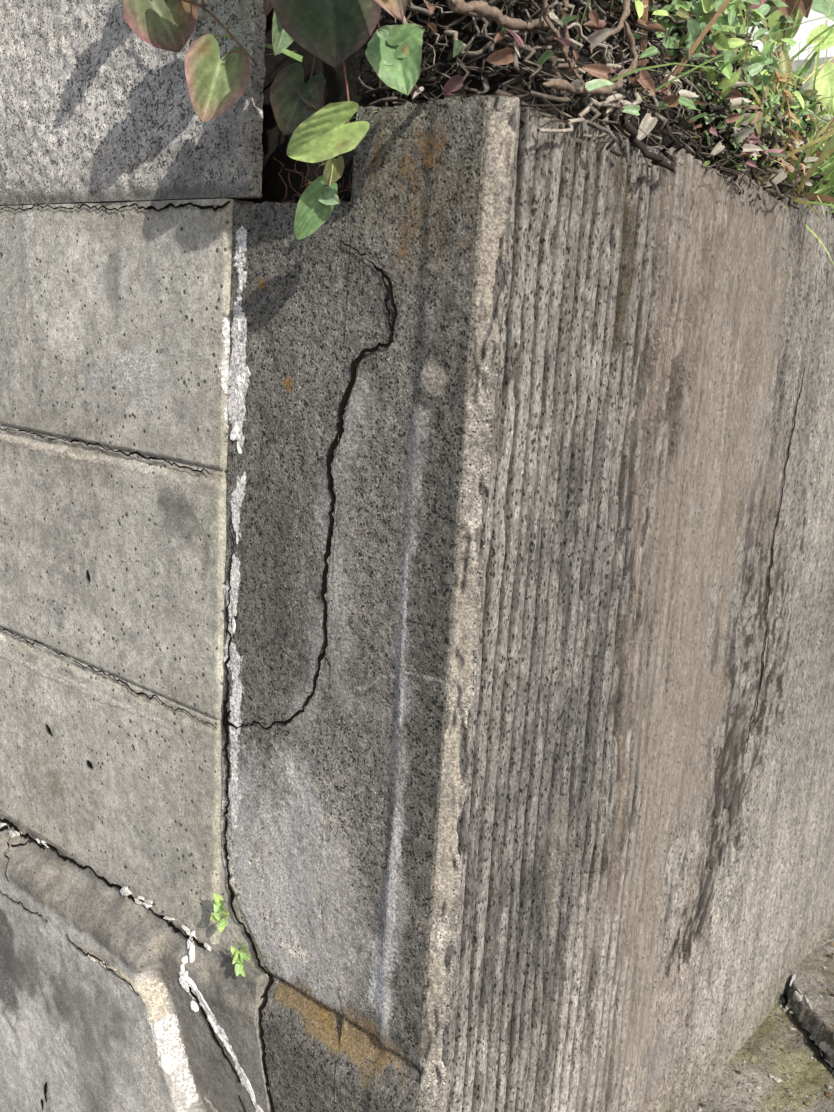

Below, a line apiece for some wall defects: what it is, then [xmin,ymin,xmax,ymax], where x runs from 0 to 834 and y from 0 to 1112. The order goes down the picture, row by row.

crack [0,240,398,1112]
damp [234,377,427,1033]
corrosion [275,982,412,1086]
damp [600,166,737,918]
spalling [779,974,834,1074]